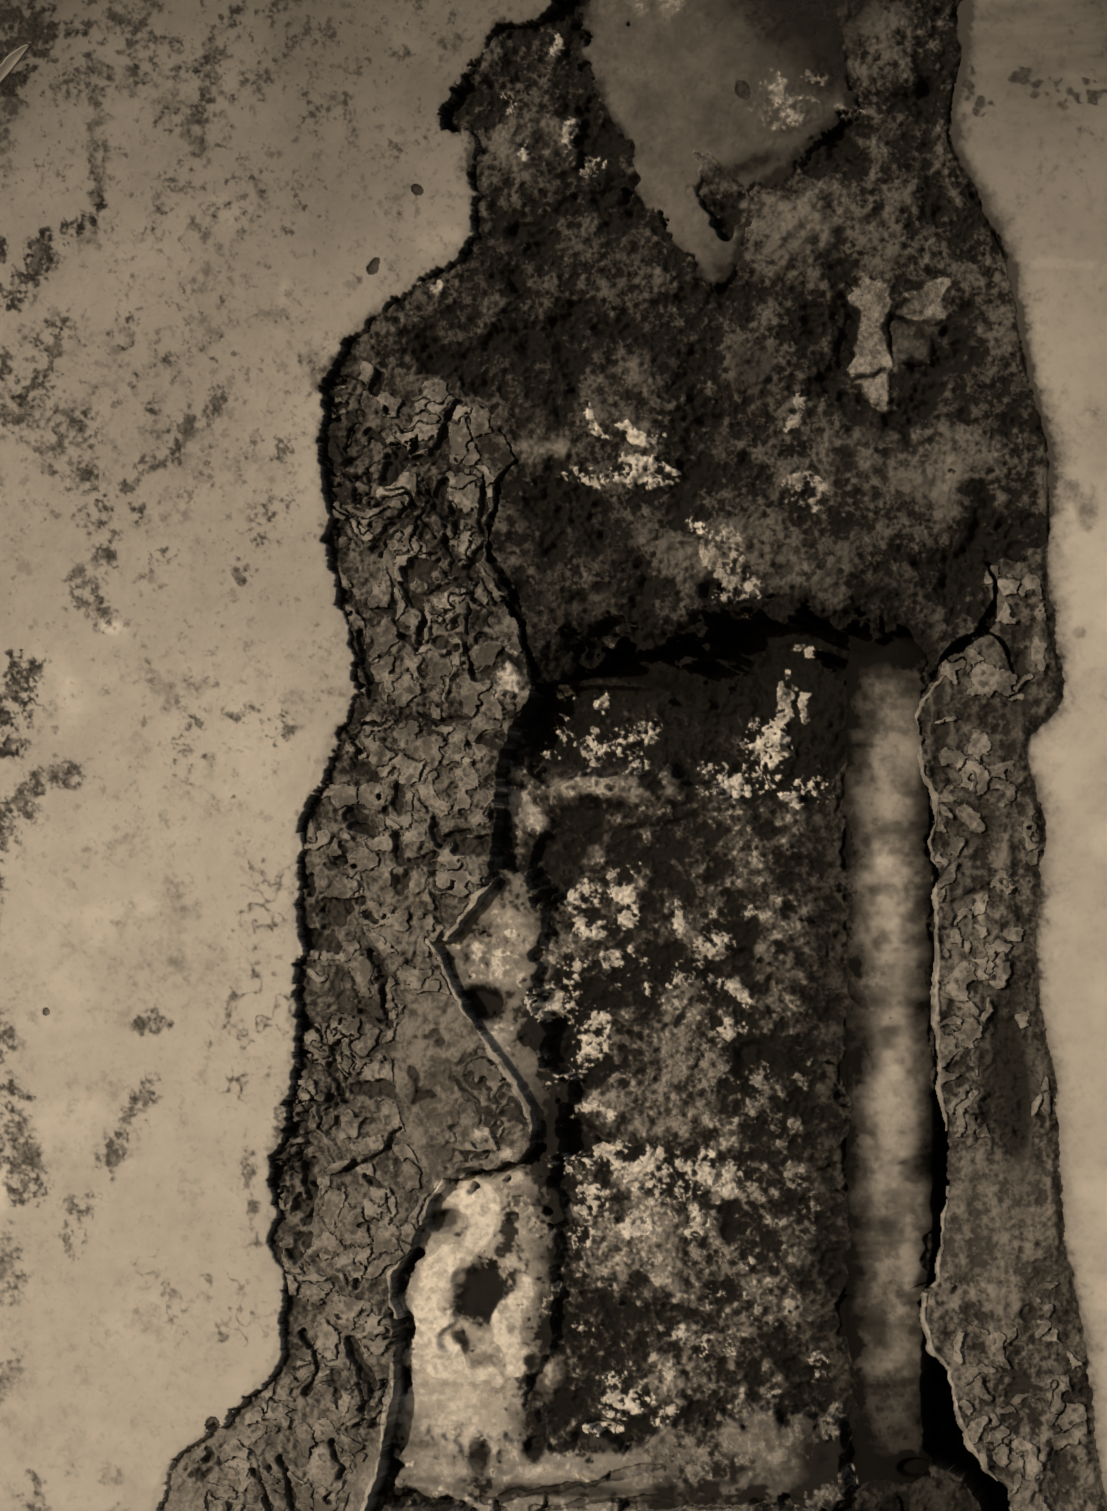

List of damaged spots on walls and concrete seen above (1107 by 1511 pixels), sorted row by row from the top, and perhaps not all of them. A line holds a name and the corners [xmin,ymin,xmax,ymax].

damp [0,0,181,97]
damp [0,145,107,311]
damp [0,317,227,567]
damp [0,649,42,757]
crack [485,432,552,695]
damp [542,685,658,774]
flaking render [342,0,1107,1511]
damp [697,670,827,809]
crack [928,562,1015,685]
peeling [160,359,546,1511]
damp [524,862,821,1272]
damp [582,1325,802,1484]